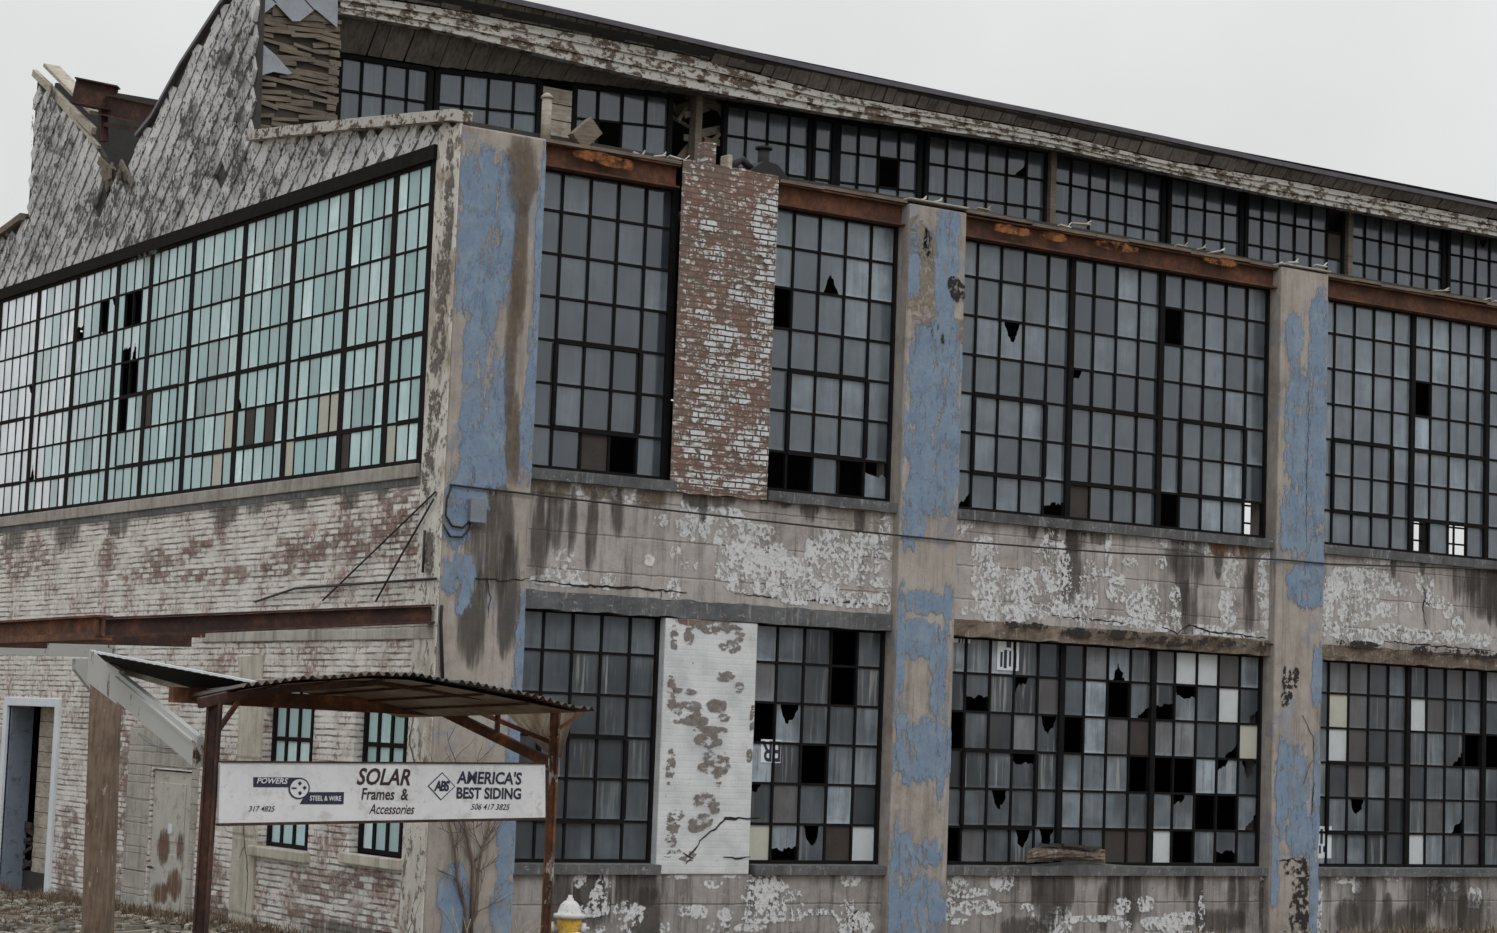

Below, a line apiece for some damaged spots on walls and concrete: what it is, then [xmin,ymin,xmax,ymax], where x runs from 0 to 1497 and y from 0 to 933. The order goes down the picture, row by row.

corrosion [578,150,633,170]
peeling [100,138,546,617]
damp [505,138,665,575]
damp [458,488,520,663]
damp [683,494,735,523]
damp [1029,526,1105,596]
peeling [644,180,1497,812]
damp [1169,540,1223,634]
crack [683,817,760,864]
peeling [573,671,1014,933]
peeling [1020,891,1214,933]
peeling [1260,732,1360,933]